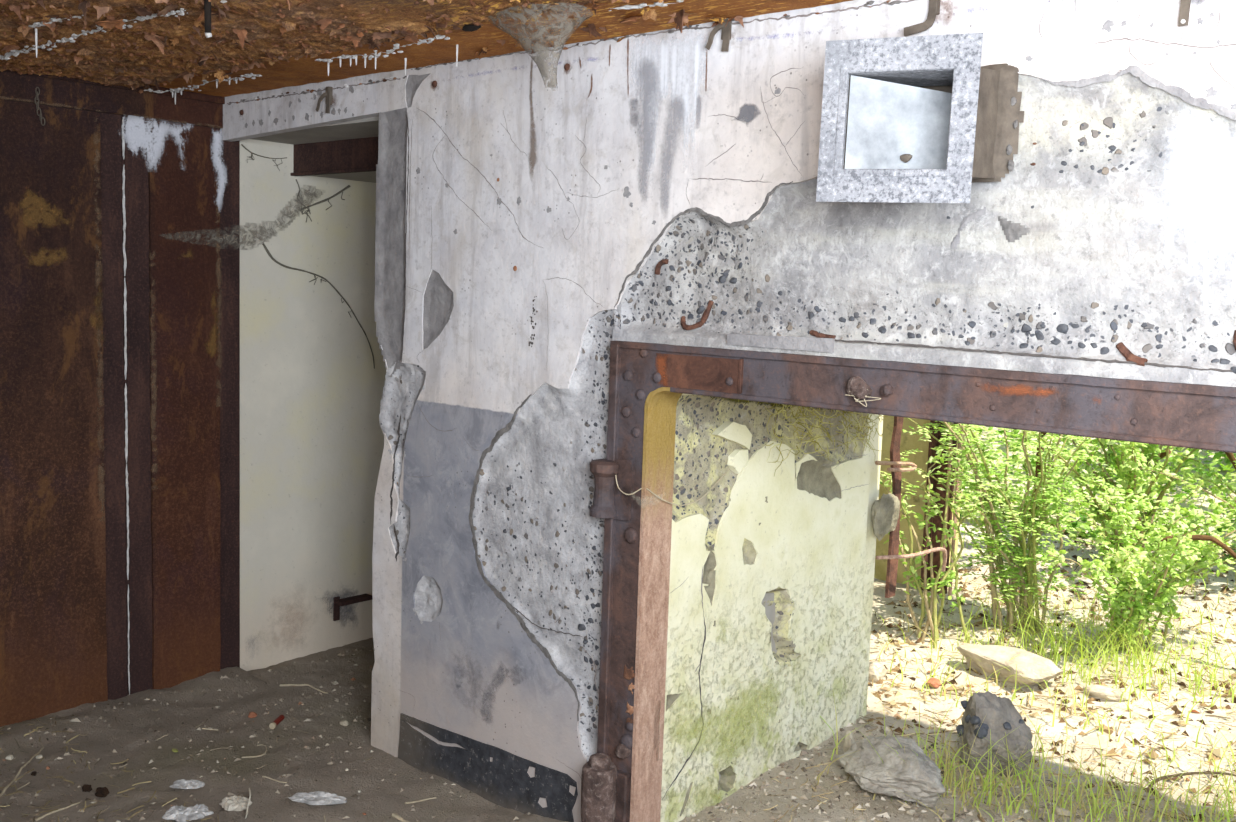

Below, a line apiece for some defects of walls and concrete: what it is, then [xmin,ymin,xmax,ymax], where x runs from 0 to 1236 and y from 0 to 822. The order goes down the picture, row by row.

rust [22,192,62,225]
damp [212,132,227,208]
peeling [0,0,474,90]
spalling [227,0,915,561]
damp [631,39,704,205]
crack [1082,2,1236,91]
damp [122,116,190,695]
spalling [469,56,1236,761]
rust [985,385,1053,395]
crack [663,569,706,798]